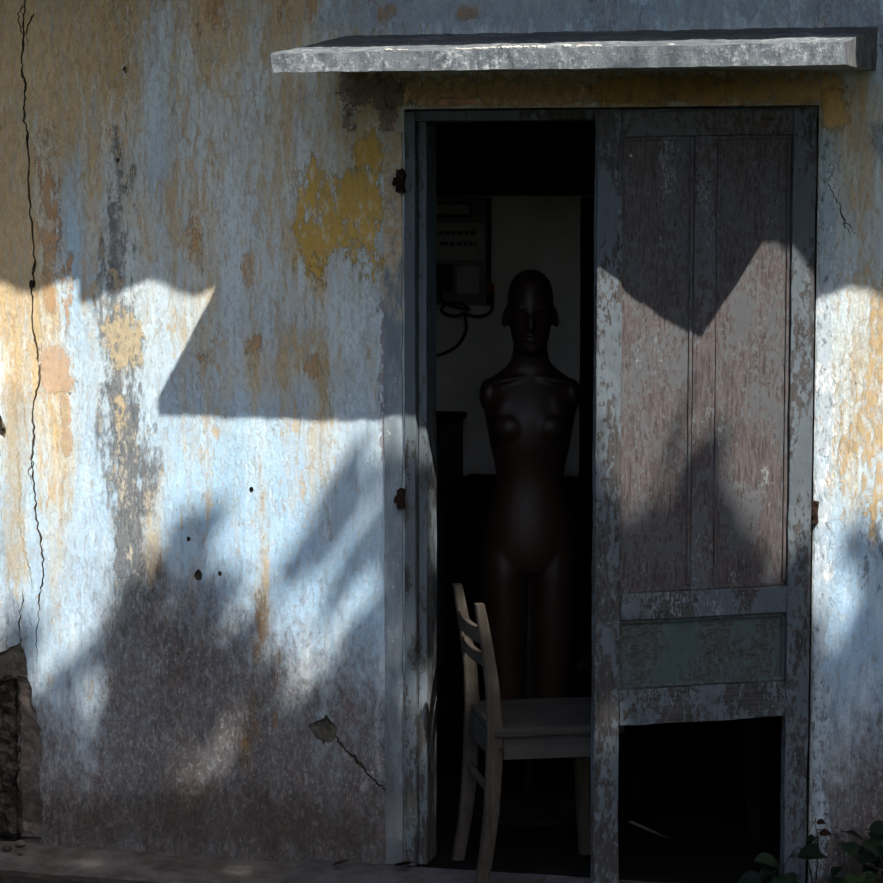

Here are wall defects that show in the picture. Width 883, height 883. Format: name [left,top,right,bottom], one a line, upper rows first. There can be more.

peeling [289,72,412,292]
crack [820,164,853,232]
crack [0,0,45,654]
peeling [377,296,385,460]
flaking render [308,715,338,745]